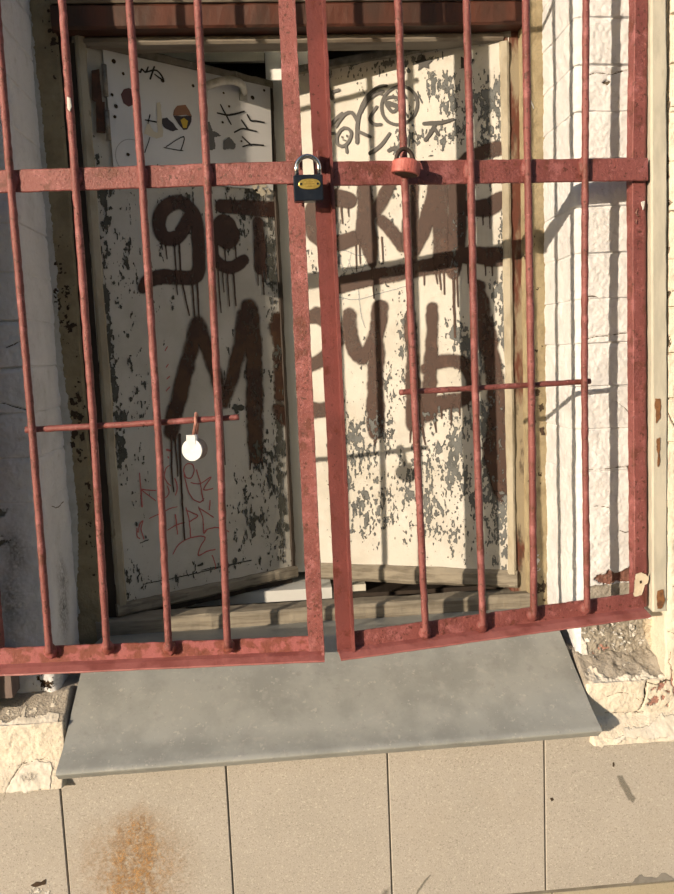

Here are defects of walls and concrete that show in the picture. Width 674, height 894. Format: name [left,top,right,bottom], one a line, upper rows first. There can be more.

spalling [590,567,649,599]
peeling [657,589,665,609]
spalling [581,618,652,680]
peeling [33,675,61,707]
spalling [641,652,674,707]
corrosion [105,822,166,894]